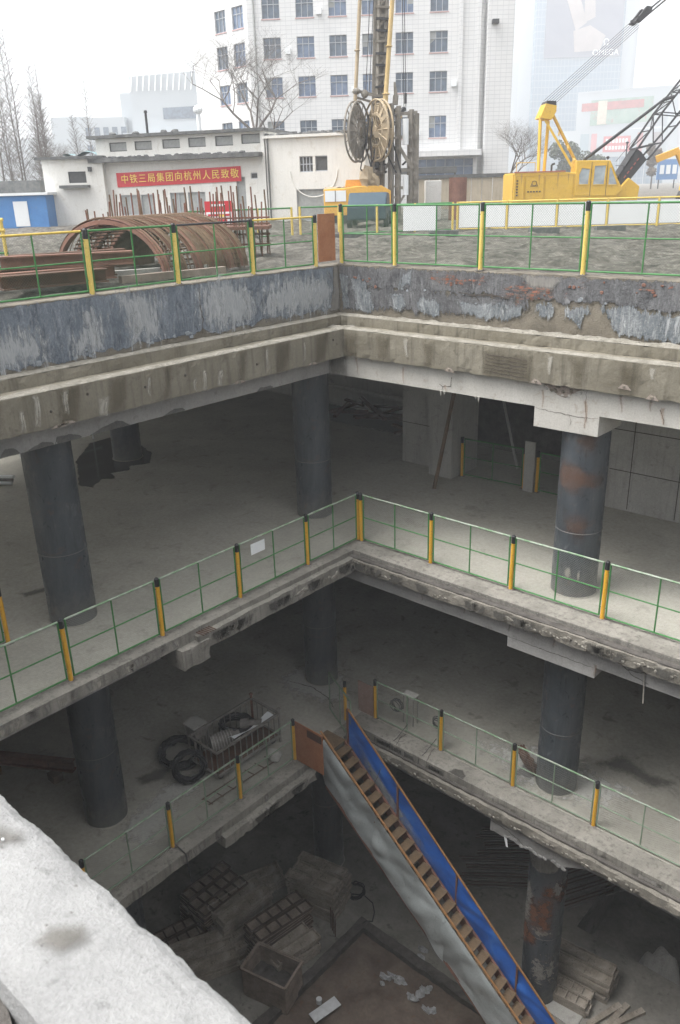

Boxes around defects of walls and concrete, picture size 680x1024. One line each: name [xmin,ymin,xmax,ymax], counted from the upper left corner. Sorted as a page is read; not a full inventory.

efflorescence [0,325,48,376]
efflorescence [69,288,162,359]
leakage [196,275,331,335]
leakage [304,336,354,375]
peeling [0,265,680,372]
flaking render [503,826,638,897]
leakage [41,929,81,947]